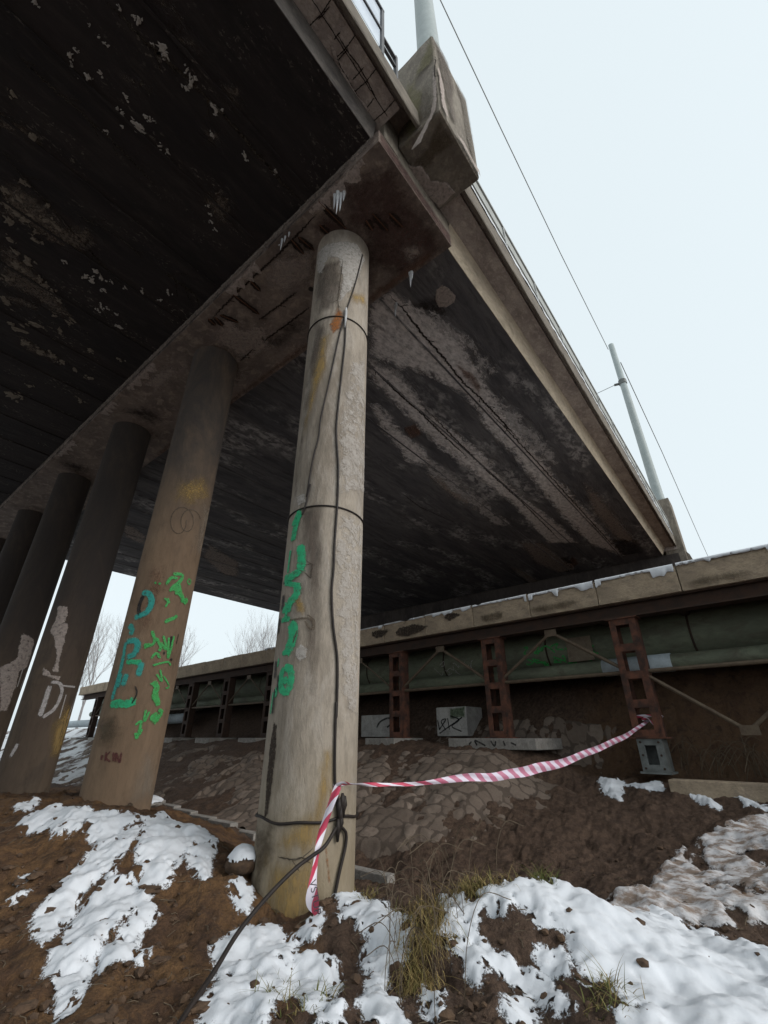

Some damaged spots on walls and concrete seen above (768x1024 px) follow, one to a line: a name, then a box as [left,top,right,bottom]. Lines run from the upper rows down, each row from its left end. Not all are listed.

peeling [67,47,103,81]
peeling [150,42,170,61]
peeling [181,64,198,91]
crack [318,7,377,108]
peeling [116,92,155,134]
rust [317,171,440,301]
spalling [435,285,456,307]
leakage [354,291,632,573]
crack [375,294,613,545]